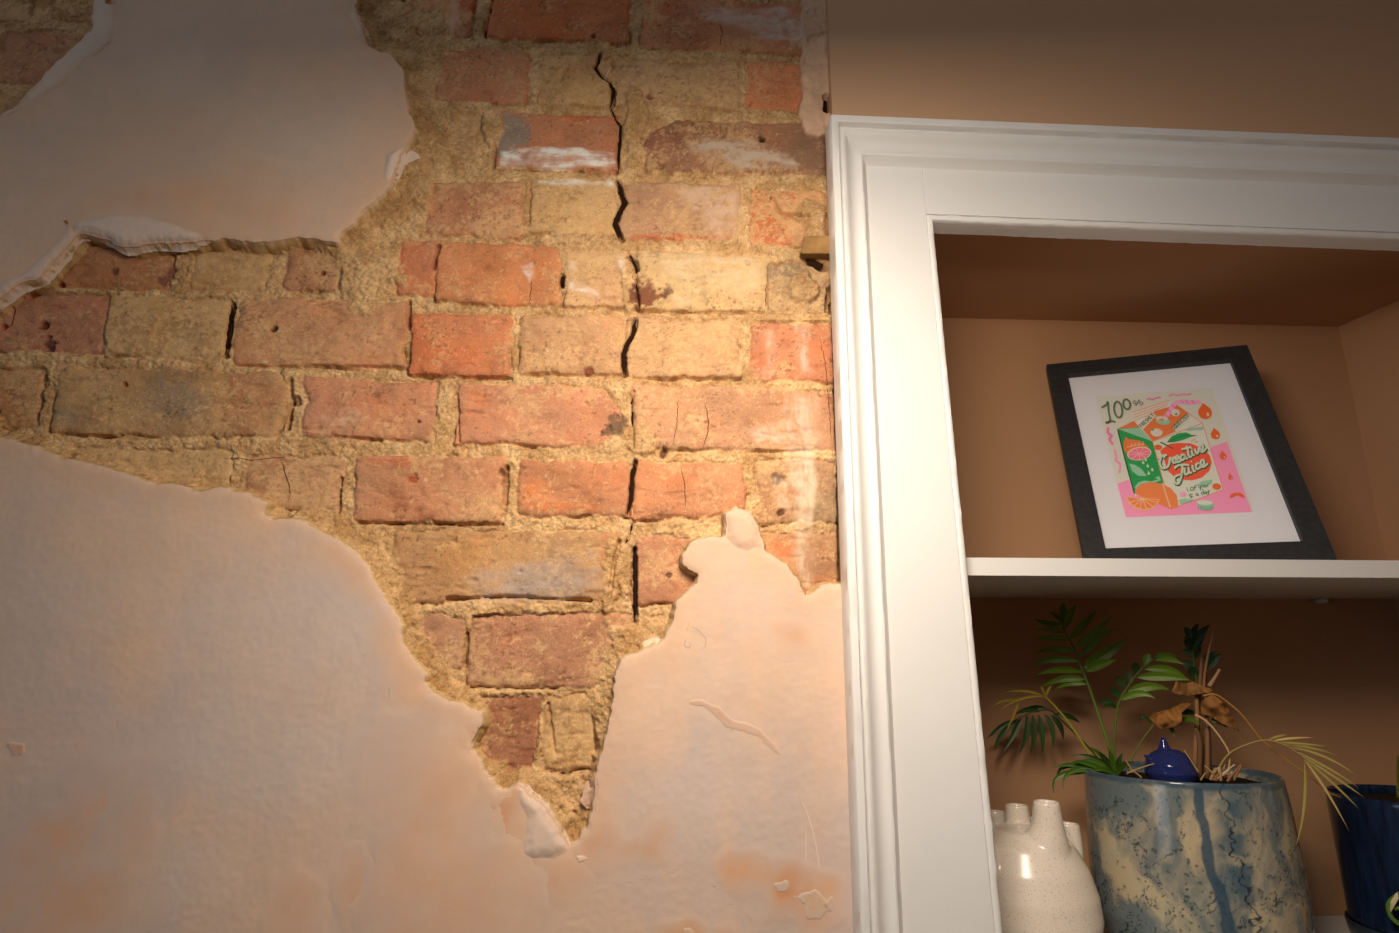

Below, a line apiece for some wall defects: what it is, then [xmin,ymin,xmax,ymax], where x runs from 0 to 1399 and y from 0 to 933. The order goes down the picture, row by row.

crack [594,54,640,427]
flaking render [0,0,841,859]
crack [626,461,637,612]
crack [673,402,709,507]